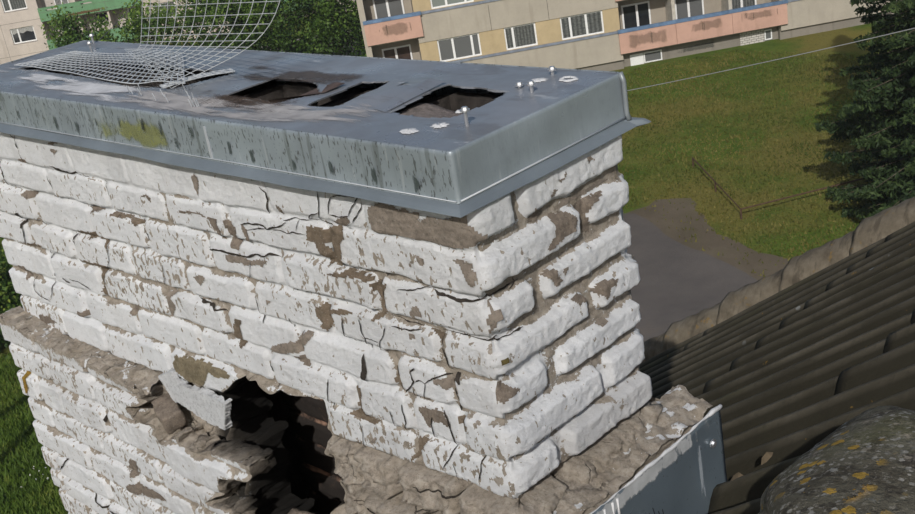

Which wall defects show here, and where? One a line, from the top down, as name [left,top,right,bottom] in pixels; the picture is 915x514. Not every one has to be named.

crack [240,187,362,235]
peeling [527,172,607,251]
crack [199,296,228,311]
crack [210,248,283,258]
spalling [306,217,393,322]
flaking render [367,202,488,287]
crack [398,279,517,303]
flaking render [173,353,230,388]
crack [341,314,423,381]
peeling [410,406,466,461]
crack [389,327,521,499]
peeling [126,459,166,501]